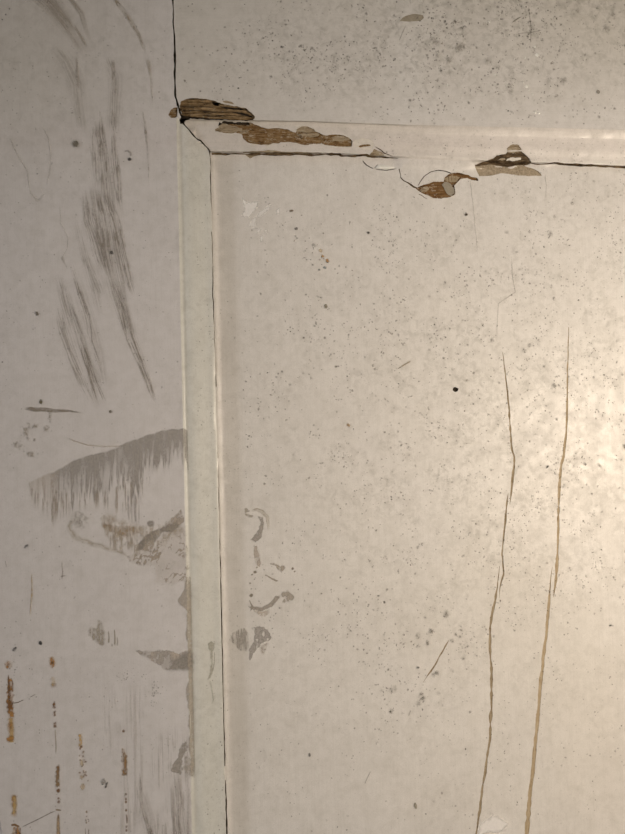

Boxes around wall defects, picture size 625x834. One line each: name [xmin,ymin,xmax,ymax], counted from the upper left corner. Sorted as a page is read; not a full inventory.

spalling [169,96,384,156]
crack [172,0,393,211]
spalling [399,144,542,199]
crack [529,161,625,169]
crack [209,232,217,347]
leakage [103,521,184,564]
crack [475,352,515,834]
crack [525,327,569,834]
rust [6,666,34,742]